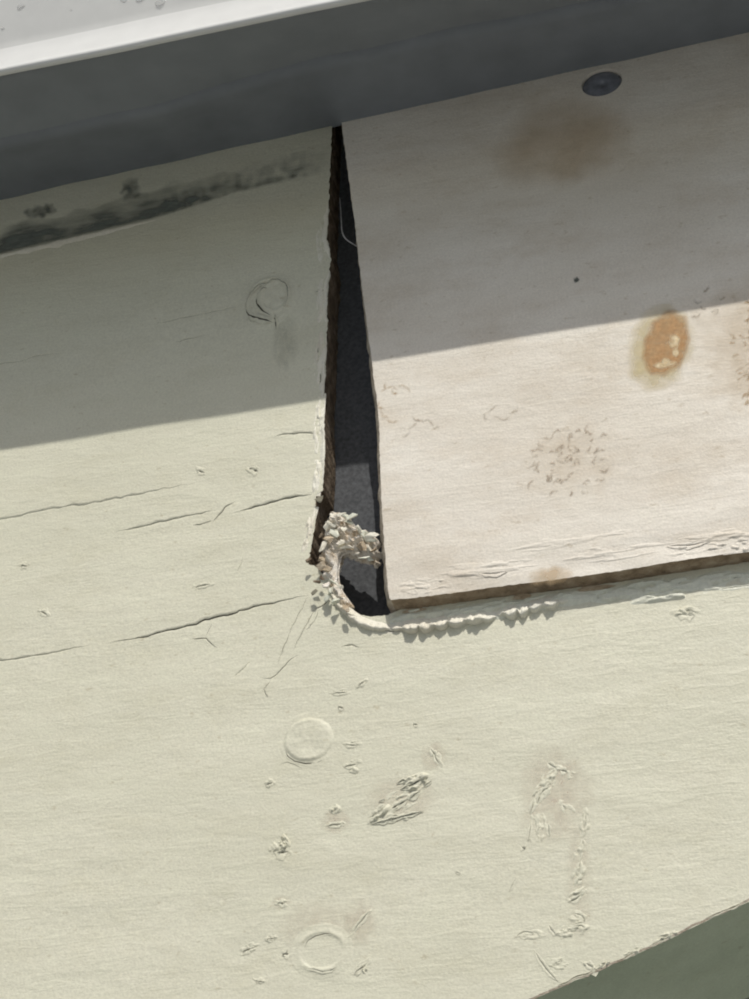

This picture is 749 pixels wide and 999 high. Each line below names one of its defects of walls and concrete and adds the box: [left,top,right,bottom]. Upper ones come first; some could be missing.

water stain [0,186,220,253]
corrosion [634,314,687,378]
crack [276,429,313,437]
peeling [301,201,749,634]
crack [0,482,195,521]
crack [117,492,312,532]
crack [0,596,303,663]
spalling [367,746,444,825]
peeling [514,762,749,999]